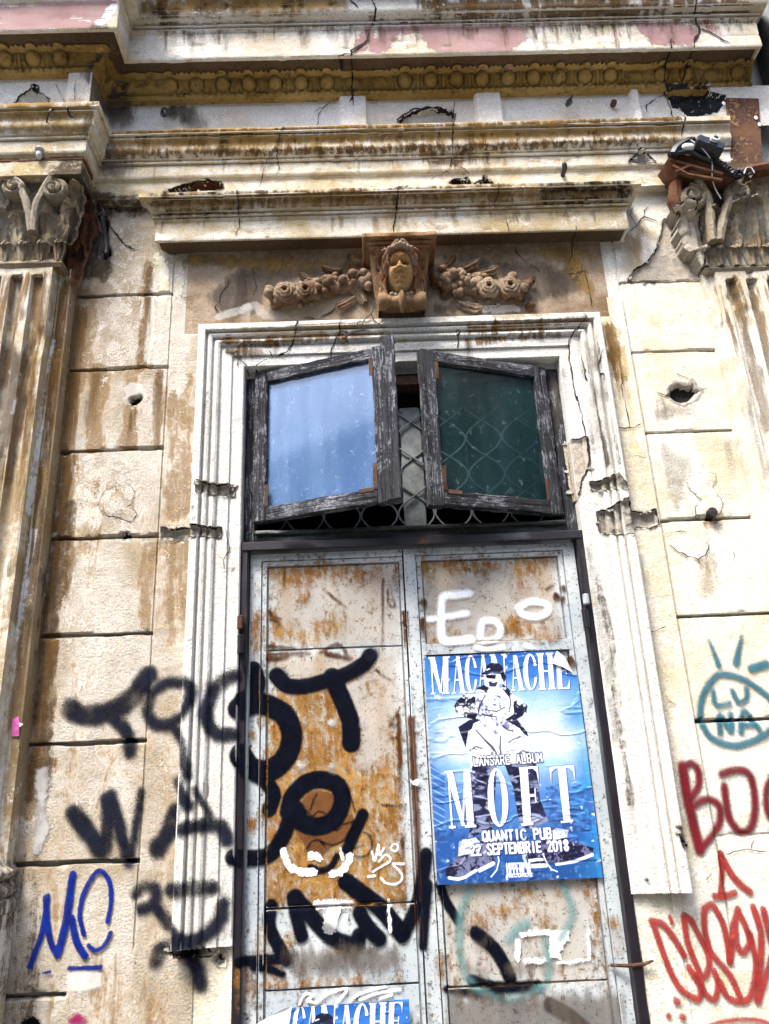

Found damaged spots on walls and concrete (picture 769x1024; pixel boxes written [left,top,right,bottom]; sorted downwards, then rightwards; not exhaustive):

crack [315,0,377,124]
peeling [354,15,527,54]
peeling [634,9,716,46]
water stain [0,80,680,173]
crack [630,206,657,231]
crack [567,227,642,473]
water stain [602,322,624,378]
water stain [0,271,102,574]
flaking render [562,436,660,535]
rust [245,592,351,661]
rust [265,558,456,647]
rust [247,690,421,929]